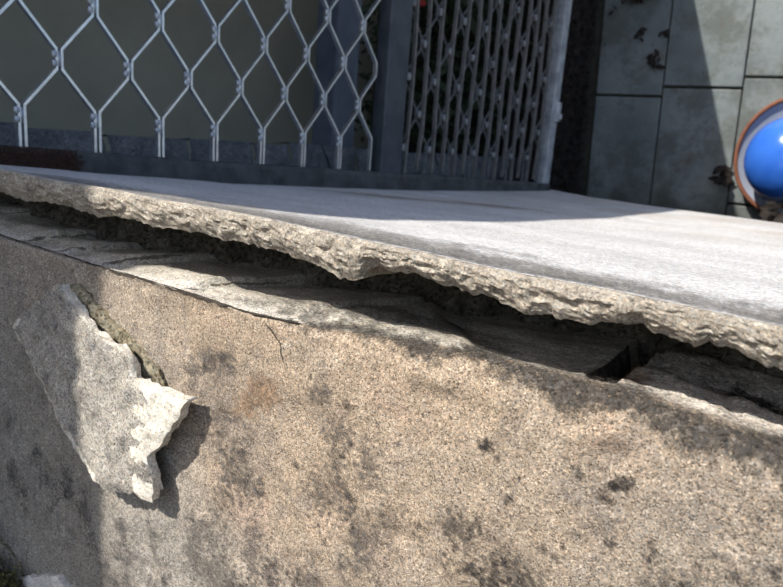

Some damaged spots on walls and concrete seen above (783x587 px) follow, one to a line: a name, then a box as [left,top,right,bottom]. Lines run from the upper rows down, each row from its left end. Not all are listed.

rust [0,145,86,172]
crack [0,192,783,383]
water stain [236,295,783,490]
water stain [302,420,395,577]
water stain [596,475,635,504]
water stain [442,505,479,566]
water stain [457,549,542,587]